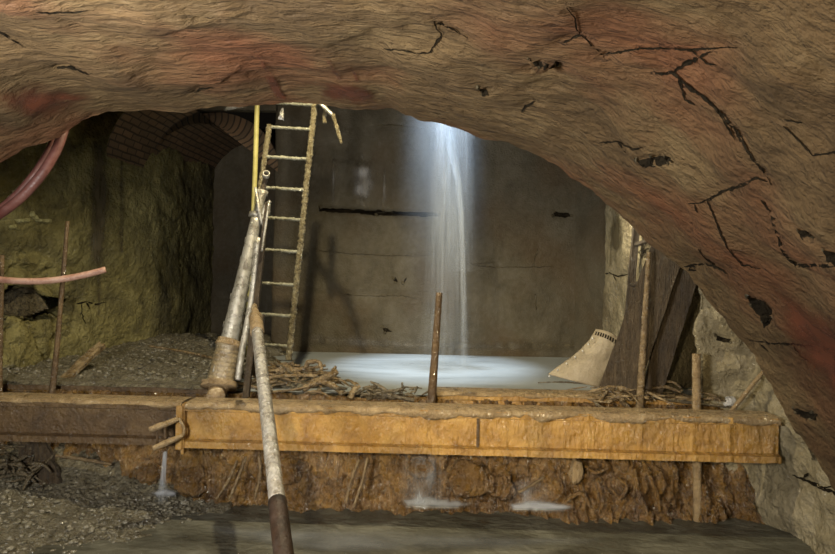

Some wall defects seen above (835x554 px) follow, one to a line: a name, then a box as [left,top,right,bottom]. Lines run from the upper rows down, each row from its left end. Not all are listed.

crack [562,8,835,274]
crack [792,473,835,495]